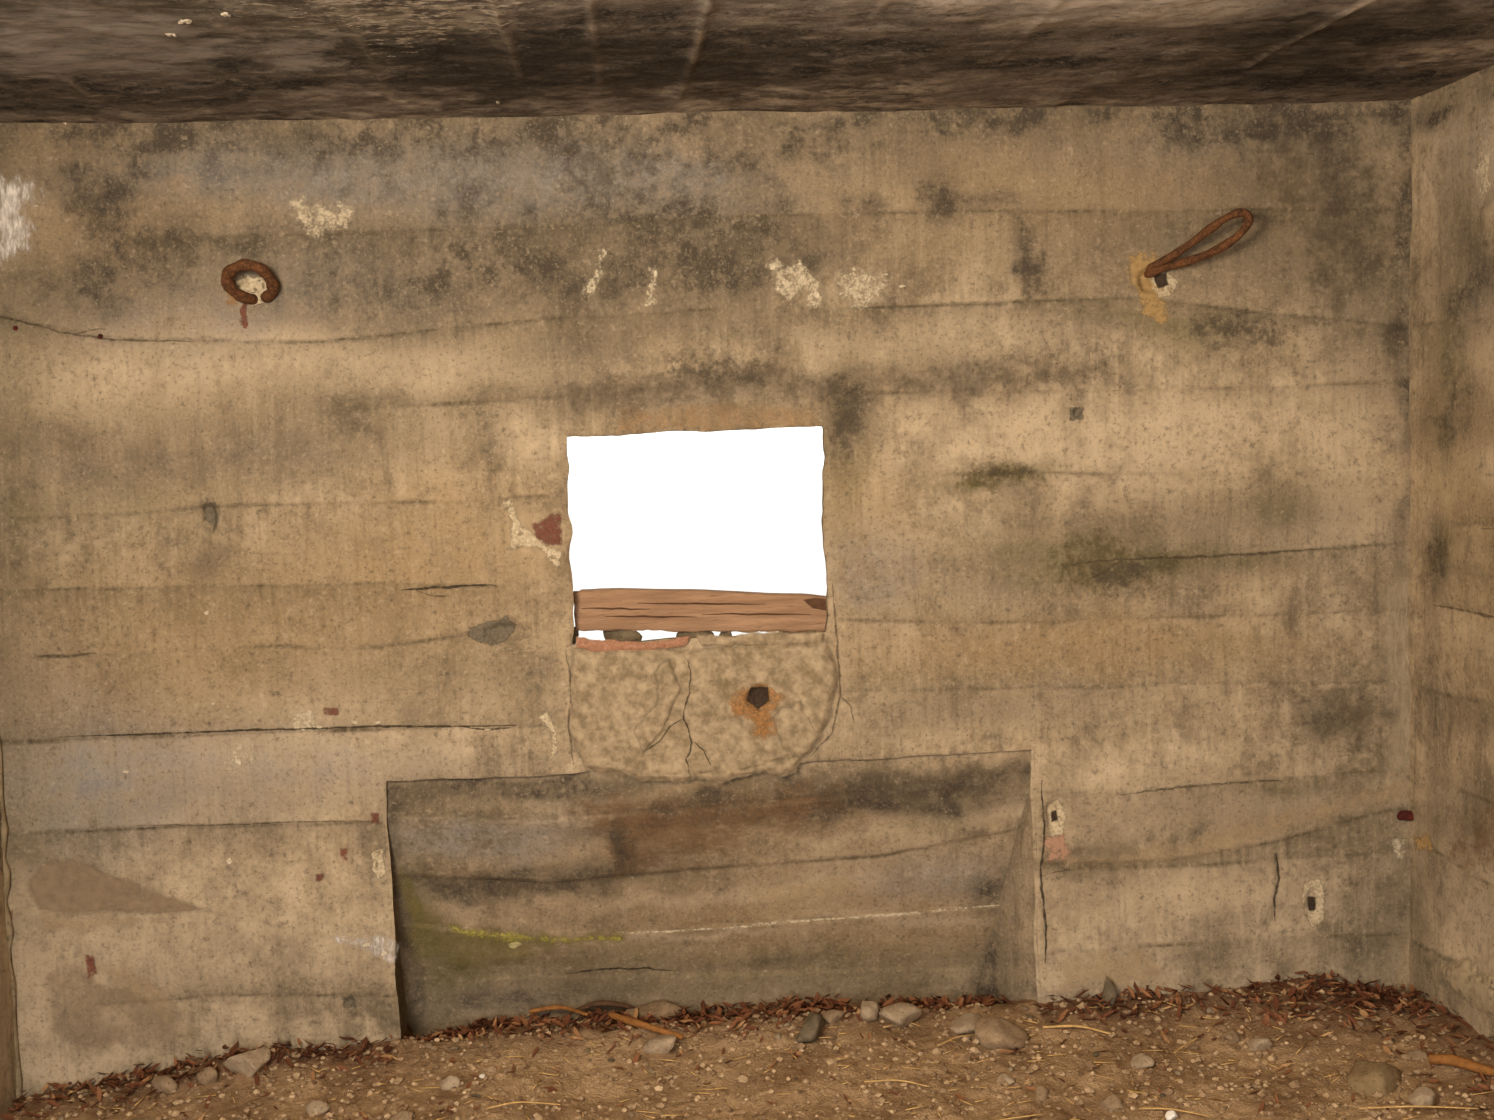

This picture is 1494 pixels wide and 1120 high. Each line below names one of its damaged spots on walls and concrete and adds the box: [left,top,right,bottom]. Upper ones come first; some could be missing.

damp [0,0,527,80]
damp [1013,0,1211,19]
damp [0,178,38,258]
corrosion [227,293,248,329]
corrosion [1126,252,1168,324]
spalling [503,499,562,566]
crack [810,584,854,757]
crack [566,657,574,765]
crack [645,657,711,777]
corrosion [728,684,784,738]